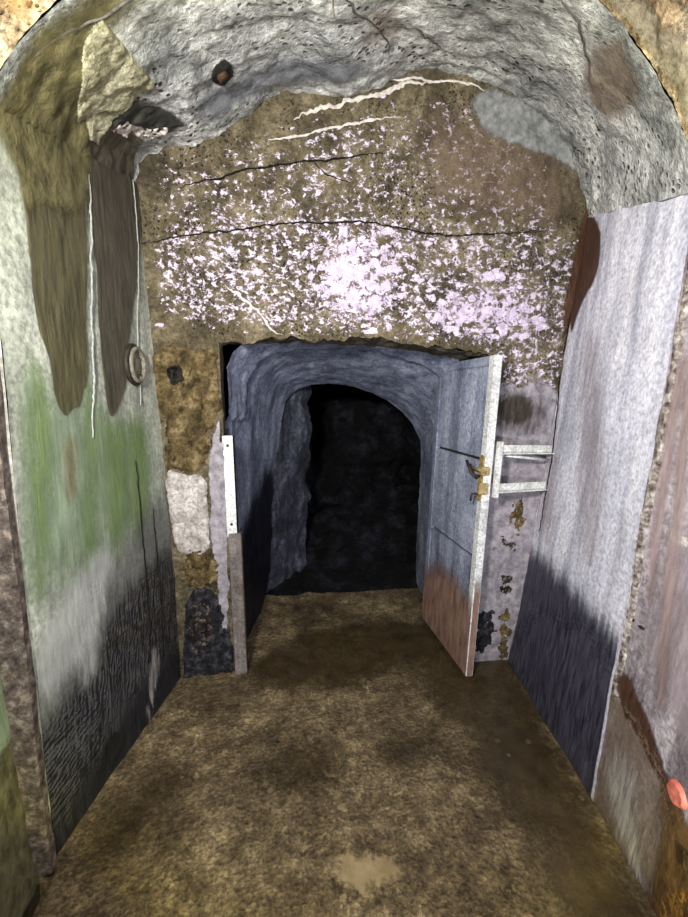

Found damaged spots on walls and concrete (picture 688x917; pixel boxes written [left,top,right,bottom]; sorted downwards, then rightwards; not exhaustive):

leakage [0,0,184,855]